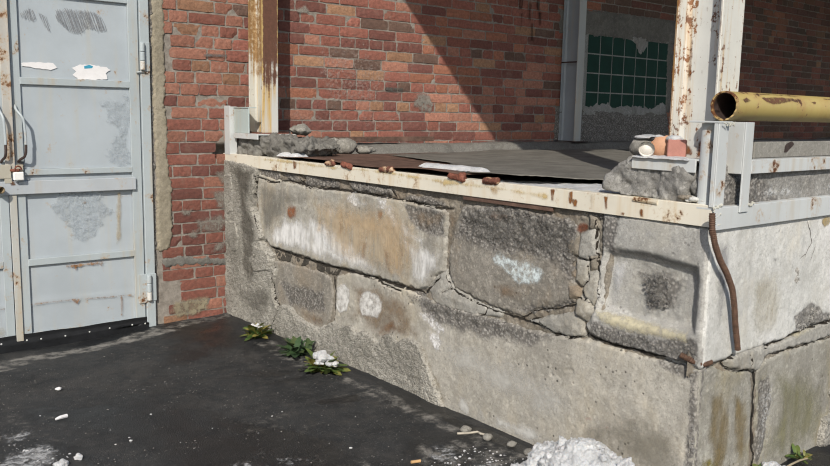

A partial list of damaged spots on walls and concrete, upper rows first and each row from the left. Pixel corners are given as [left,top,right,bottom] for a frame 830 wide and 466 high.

corrosion [757,93,799,104]
flaking render [223,160,445,407]
flaking render [816,409,830,447]